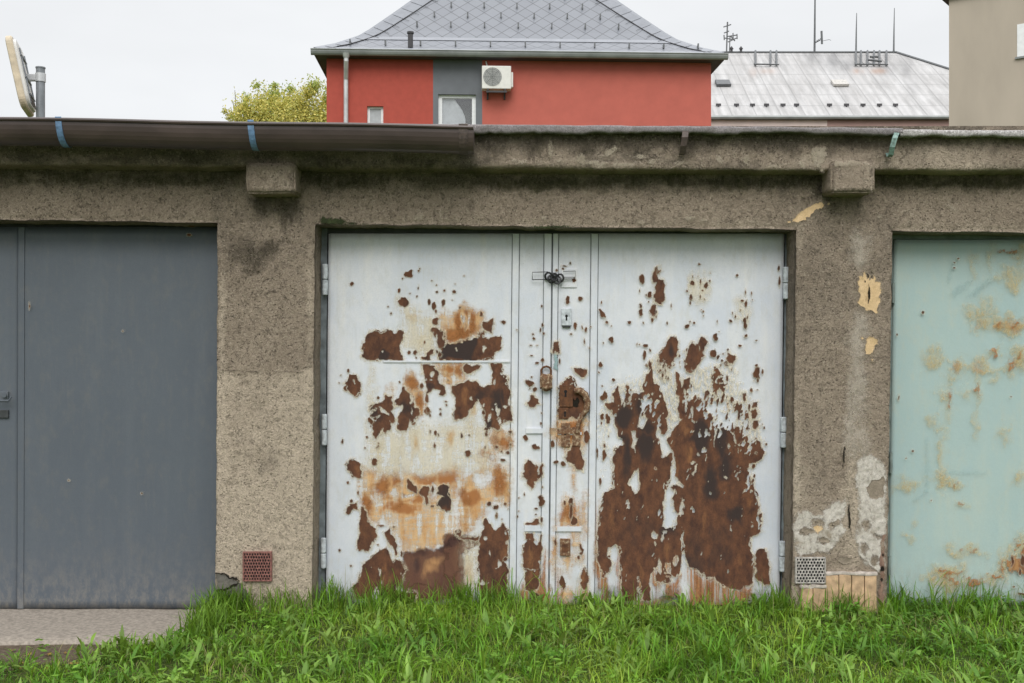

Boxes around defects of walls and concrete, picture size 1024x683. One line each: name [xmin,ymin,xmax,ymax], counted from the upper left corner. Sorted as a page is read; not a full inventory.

peeling [788,202,830,223]
peeling [856,272,882,314]
peeling [861,336,878,361]
corrosion [339,369,362,397]
corrosion [345,263,772,606]
spalling [793,454,887,603]